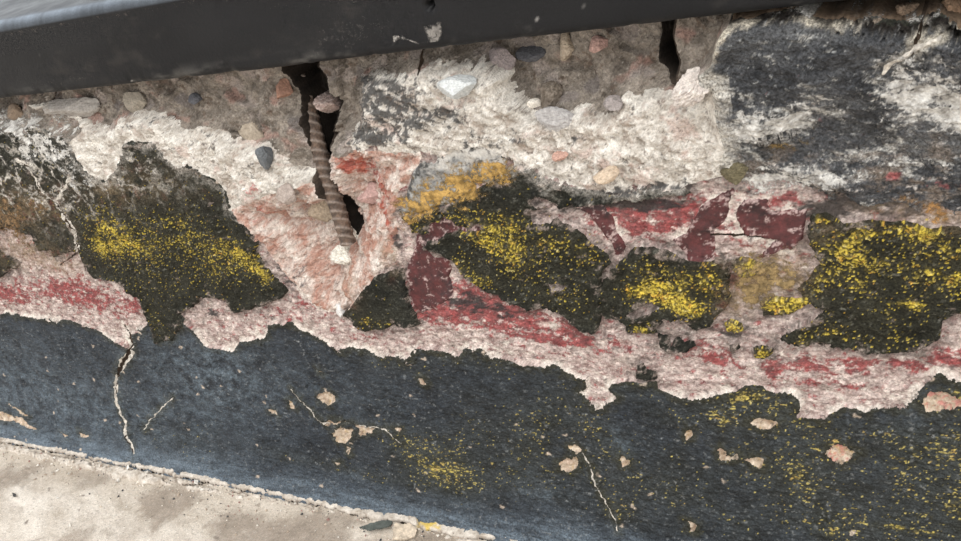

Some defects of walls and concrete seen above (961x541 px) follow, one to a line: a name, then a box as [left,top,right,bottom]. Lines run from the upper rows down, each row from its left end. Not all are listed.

crack [882,0,944,75]
peeling [0,0,961,419]
peeling [0,403,36,430]
crack [1,325,251,494]
peeling [325,420,375,454]
peeling [751,418,778,429]